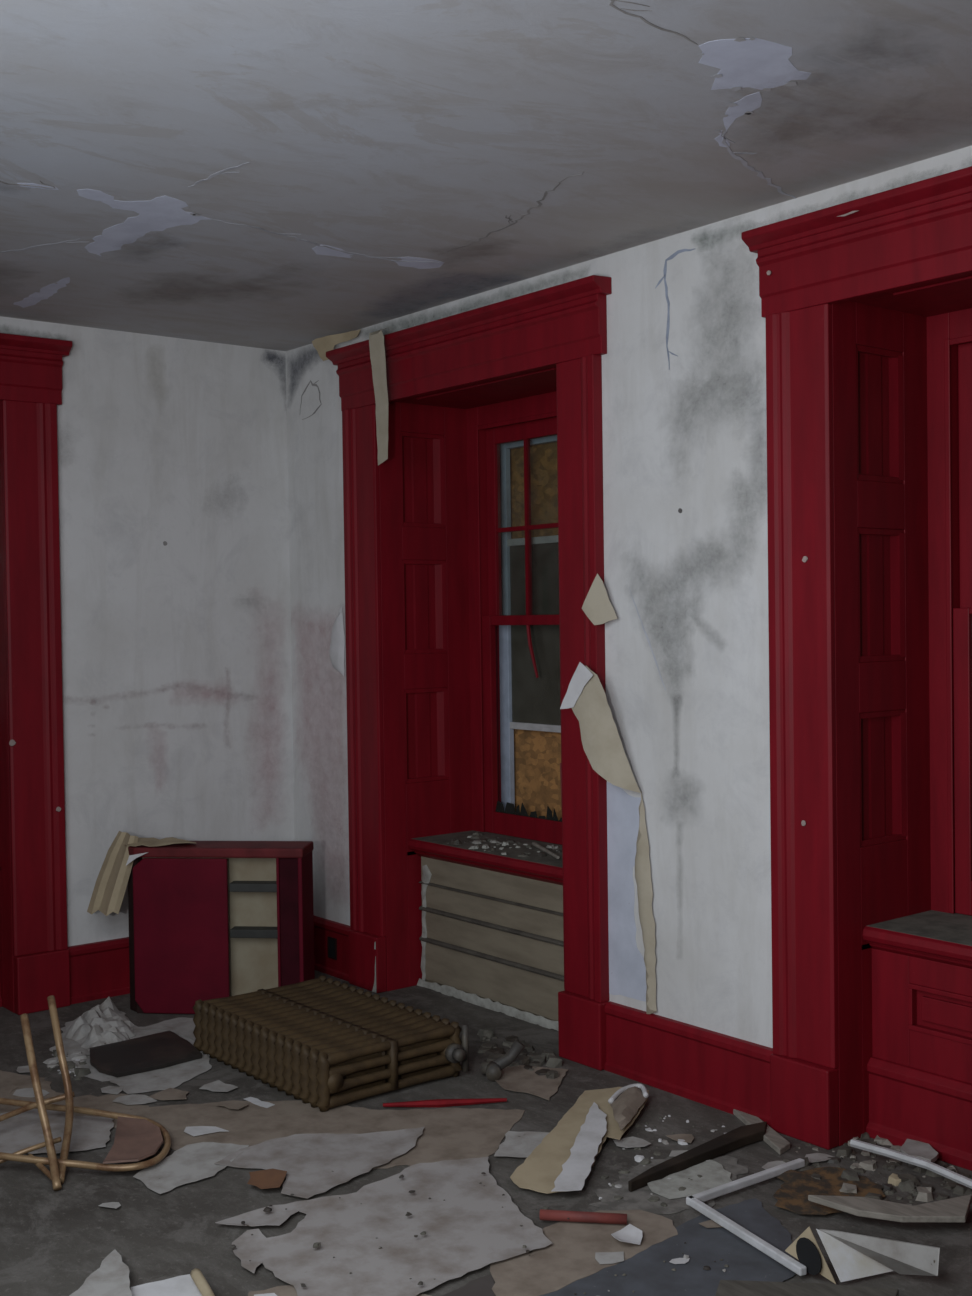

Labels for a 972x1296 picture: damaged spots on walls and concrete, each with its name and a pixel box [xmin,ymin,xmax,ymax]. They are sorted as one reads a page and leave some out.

crack [609,0,698,45]
peeling [698,37,811,147]
peeling [77,189,210,256]
crack [438,173,583,255]
peeling [14,277,70,308]
crack [655,248,695,370]
peeling [560,662,593,709]
flaking render [607,782,647,1002]
damp [635,792,657,1014]